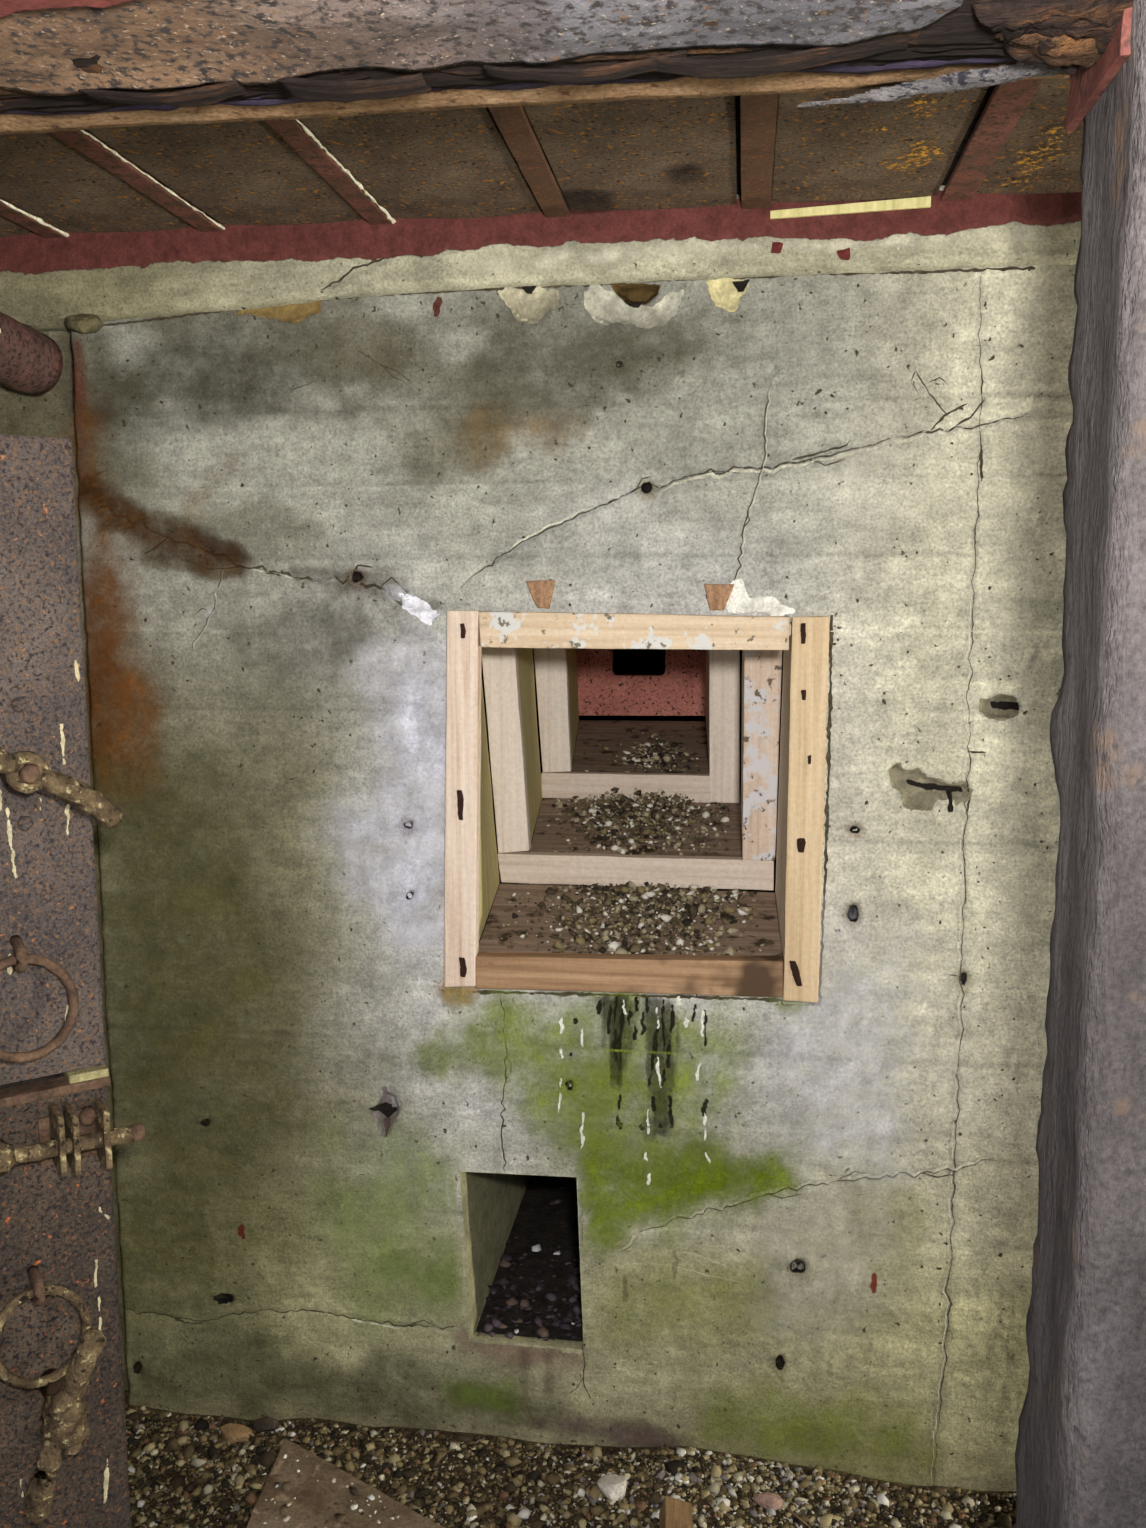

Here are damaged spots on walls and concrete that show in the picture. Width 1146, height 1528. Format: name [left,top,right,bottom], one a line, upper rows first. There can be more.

rust [878,133,950,172]
rust [988,122,1080,194]
peeling [0,190,1082,275]
spalling [582,283,685,329]
rust [80,481,245,578]
crack [188,550,436,649]
spalling [889,762,973,812]
crack [467,273,1030,1486]
damp [558,1016,583,1058]
damp [596,996,708,1134]
damp [701,1099,711,1163]
crack [132,1309,459,1330]